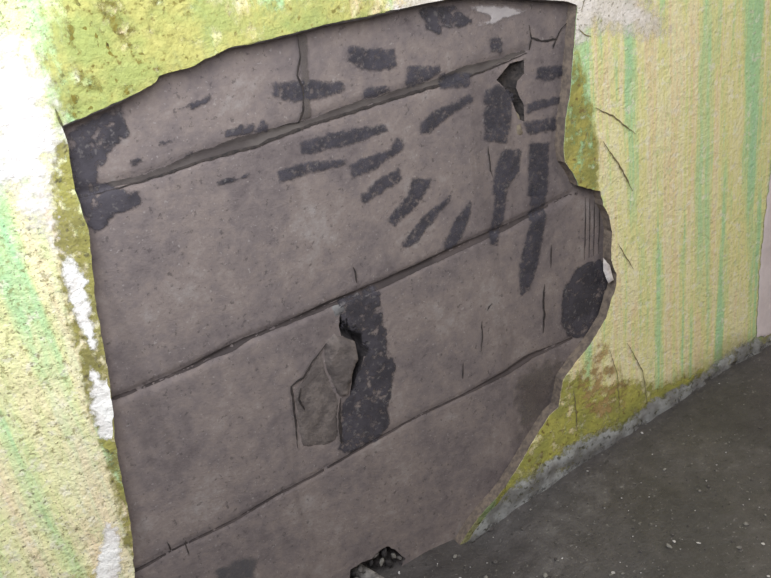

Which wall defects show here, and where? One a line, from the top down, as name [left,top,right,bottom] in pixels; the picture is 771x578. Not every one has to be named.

leakage [0,0,373,428]
crack [273,41,304,129]
leakage [278,125,404,181]
leakage [382,0,472,34]
leakage [484,85,549,295]
leakage [525,58,599,191]
leakage [557,0,672,45]
crack [597,108,633,132]
crack [603,141,633,191]
flaking render [55,0,617,578]
leakage [337,286,396,453]
leakage [466,337,771,544]